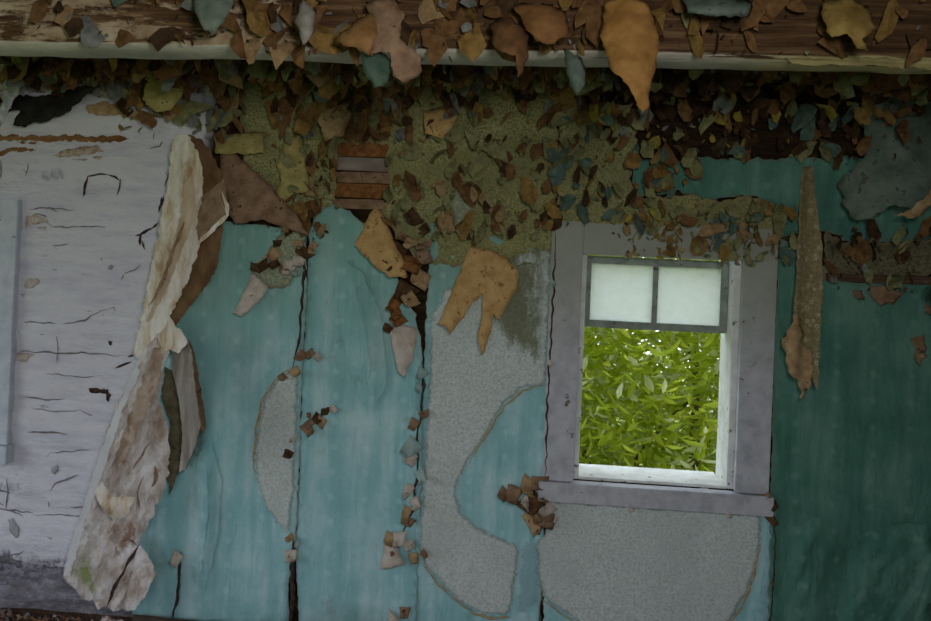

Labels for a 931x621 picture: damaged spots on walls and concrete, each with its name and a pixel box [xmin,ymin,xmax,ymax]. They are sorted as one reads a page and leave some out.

peeling [0,0,931,278]
peeling [823,216,931,293]
spalling [89,388,111,402]
peeling [390,324,417,378]
peeling [420,134,550,620]
peeling [252,369,297,530]
spalling [8,518,20,538]
peeling [380,545,406,569]
peeling [536,502,773,621]